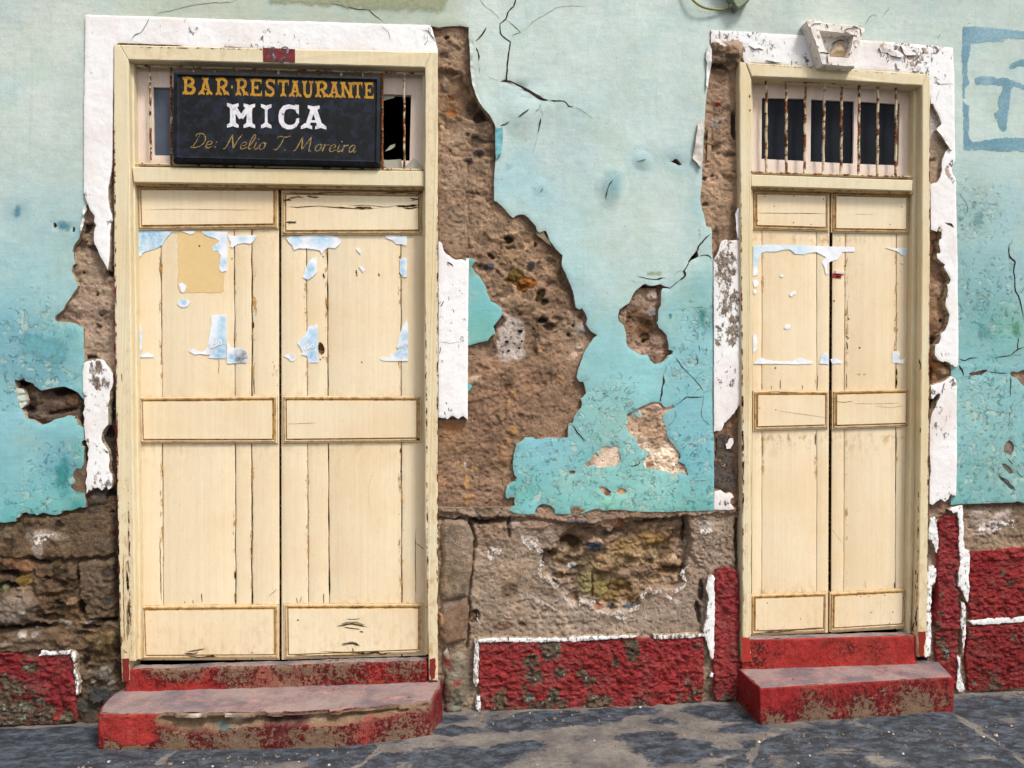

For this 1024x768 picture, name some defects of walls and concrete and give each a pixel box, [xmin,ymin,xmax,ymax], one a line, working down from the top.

crack [476,0,592,151]
flaking render [693,42,744,257]
peeling [930,106,947,184]
flaking render [57,206,116,373]
flaking render [432,27,596,521]
flaking render [618,285,671,364]
crack [629,235,711,288]
flaking render [929,232,950,409]
flaking render [16,380,85,426]
flaking render [71,389,118,524]
flaking render [626,402,687,475]
flaking render [711,408,739,518]